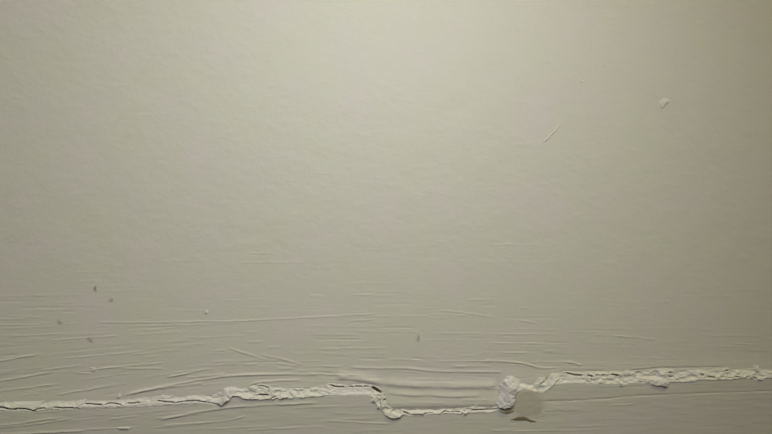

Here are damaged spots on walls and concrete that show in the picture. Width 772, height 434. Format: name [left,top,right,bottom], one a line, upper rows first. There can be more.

peeling [240,386,310,400]
peeling [11,400,44,410]
crack [0,402,139,411]